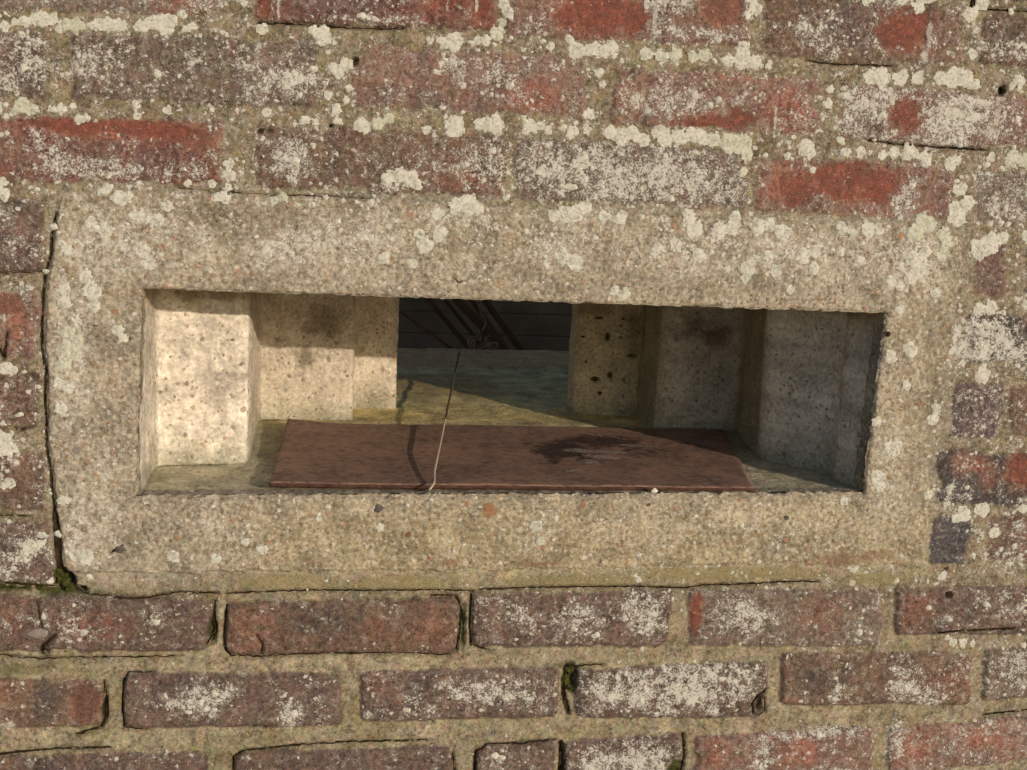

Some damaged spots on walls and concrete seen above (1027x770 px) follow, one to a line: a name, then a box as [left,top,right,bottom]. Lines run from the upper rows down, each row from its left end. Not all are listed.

crack [0,213,818,756]